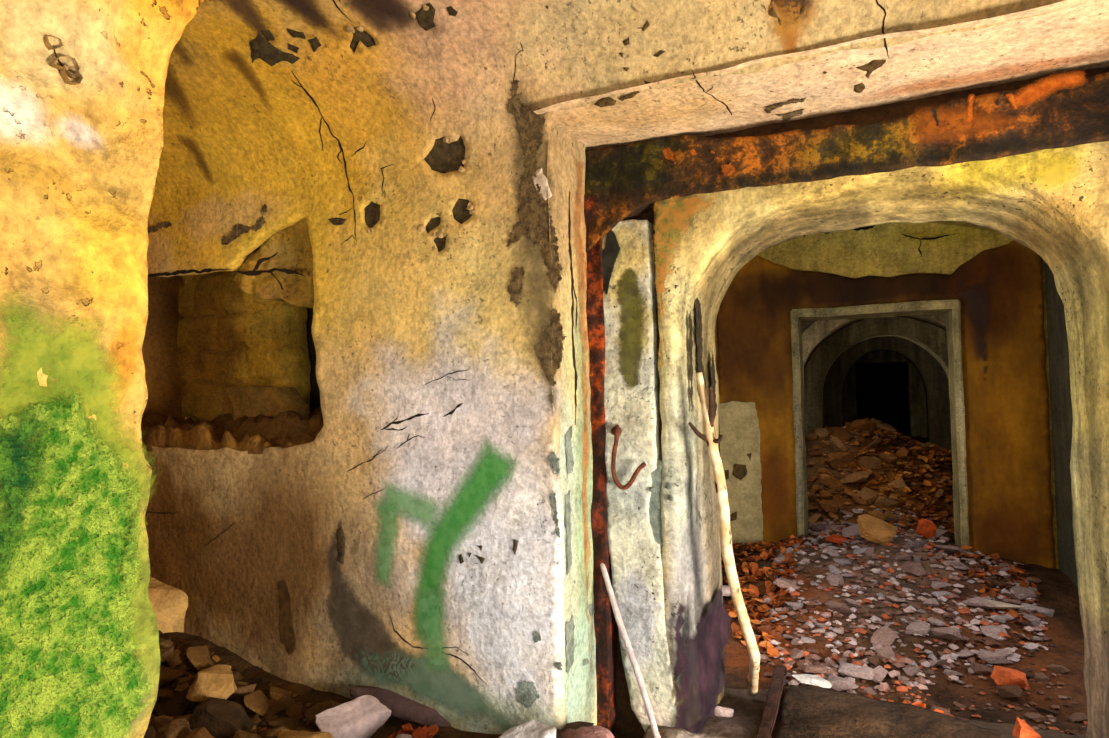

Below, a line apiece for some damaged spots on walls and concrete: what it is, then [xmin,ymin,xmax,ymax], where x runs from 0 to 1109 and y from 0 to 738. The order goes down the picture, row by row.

spalling [346,25,376,53]
spalling [410,3,458,31]
rust [774,4,809,54]
crack [876,0,893,58]
rust [918,72,1082,141]
crack [292,72,366,245]
spalling [424,136,465,174]
flaking render [505,80,564,293]
spalling [364,201,380,233]
spalling [417,198,474,252]
crack [148,252,304,290]
flaking render [534,307,567,402]